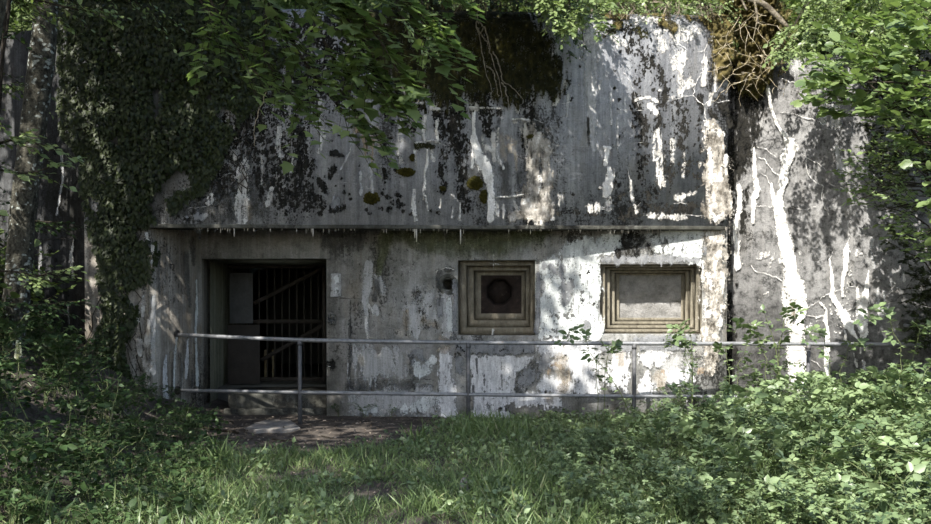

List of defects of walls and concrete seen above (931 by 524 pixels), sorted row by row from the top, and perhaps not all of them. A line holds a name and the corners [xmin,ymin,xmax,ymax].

water stain [137,10,531,399]
water stain [511,352,551,393]
peeling [391,118,735,415]
water stain [552,15,907,391]